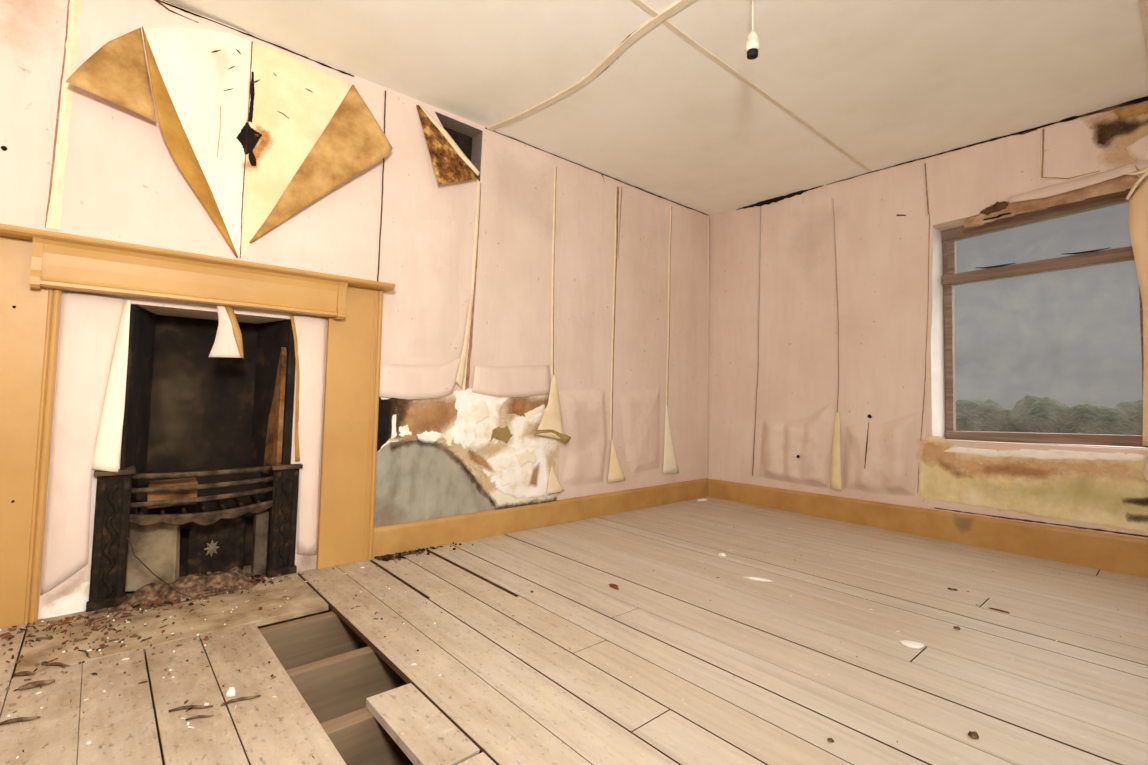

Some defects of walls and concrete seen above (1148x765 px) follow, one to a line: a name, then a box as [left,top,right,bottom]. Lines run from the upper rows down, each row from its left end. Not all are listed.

flaking render [141,0,270,258]
spalling [435,112,483,181]
spalling [374,389,558,527]